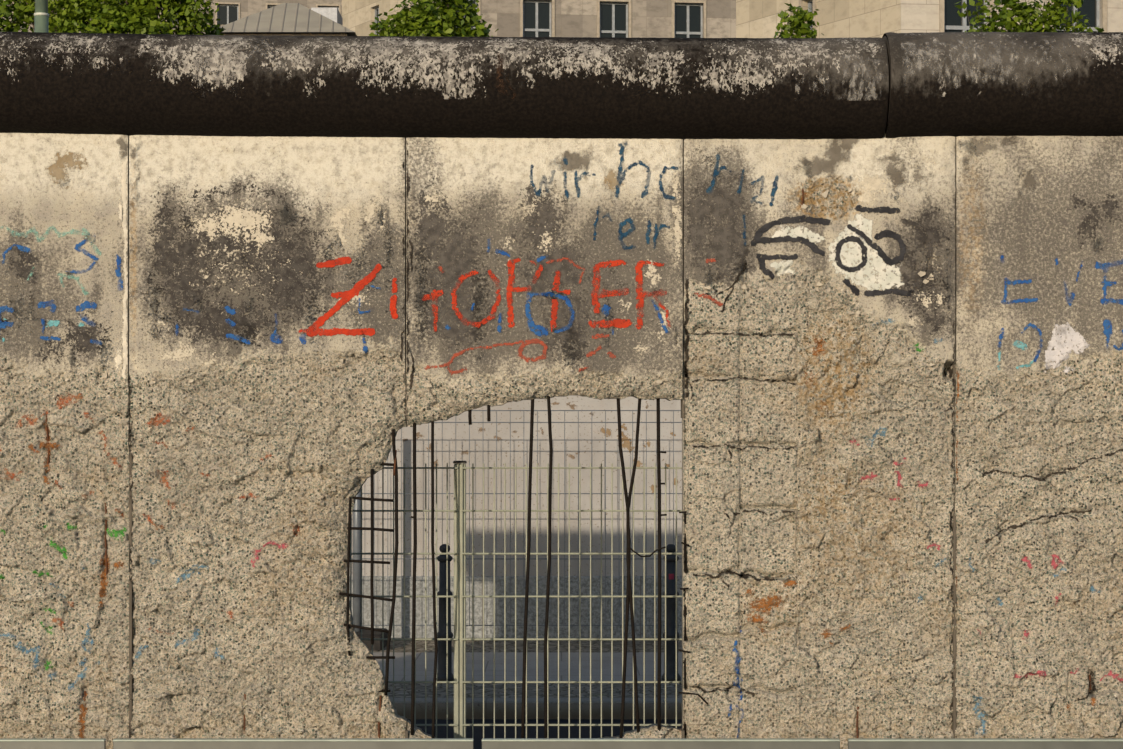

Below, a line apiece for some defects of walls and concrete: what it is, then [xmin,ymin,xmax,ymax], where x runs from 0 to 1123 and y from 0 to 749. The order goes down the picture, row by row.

water stain [117,139,136,165]
water stain [132,173,352,366]
water stain [363,176,506,361]
rust [28,422,60,484]
spalling [0,158,1123,749]
rust [741,580,797,635]